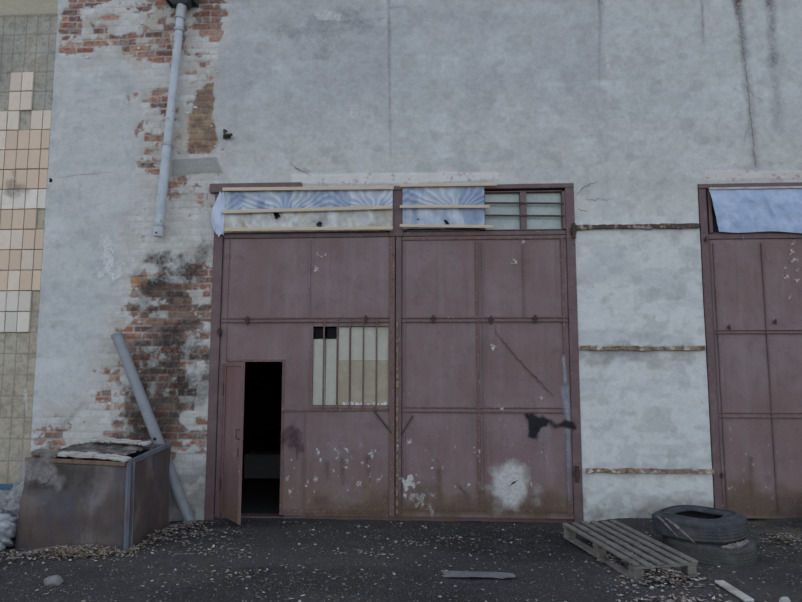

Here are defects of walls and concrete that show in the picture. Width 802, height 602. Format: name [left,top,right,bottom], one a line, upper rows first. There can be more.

peeling [0,0,235,154]
spalling [94,235,213,467]
peeling [402,475,415,496]